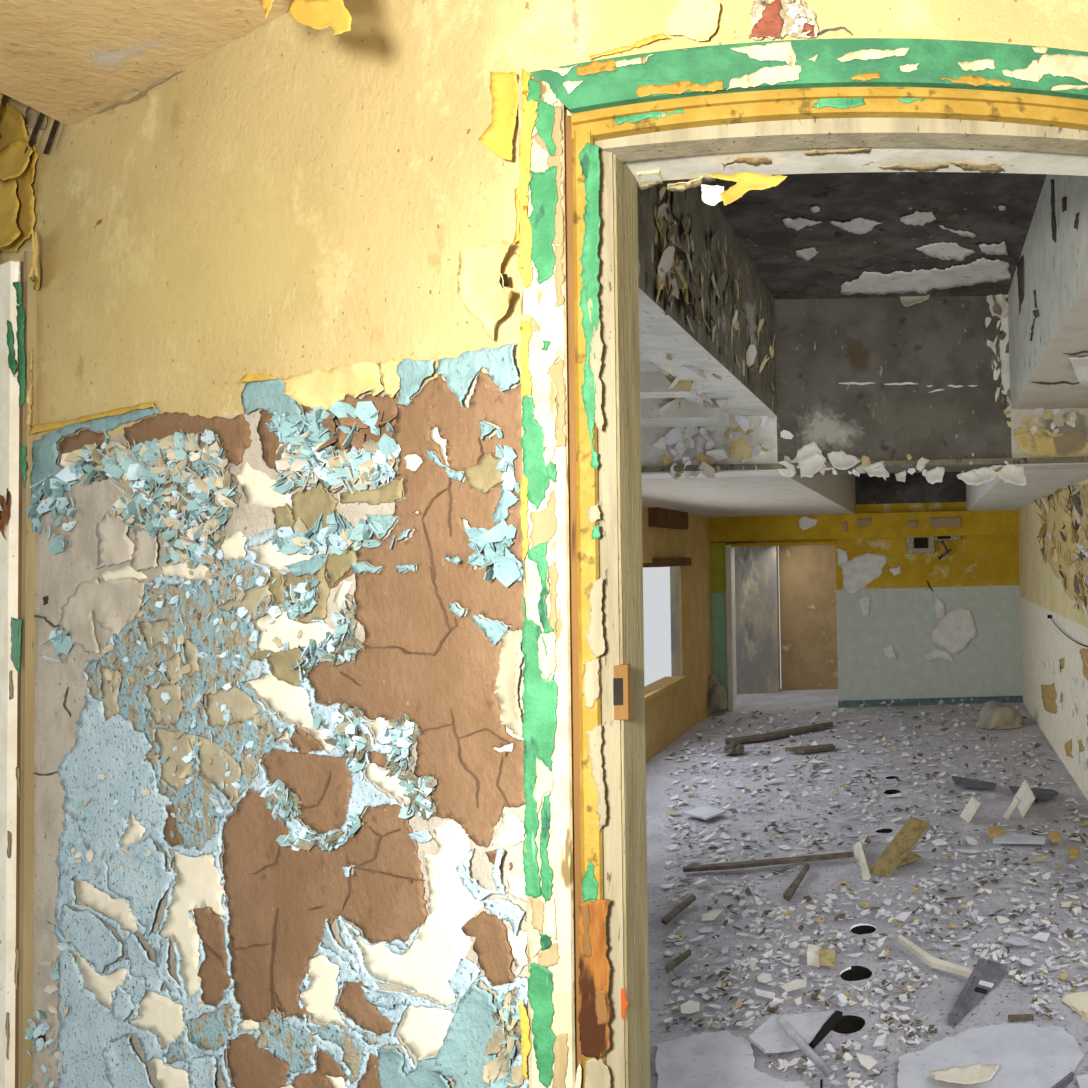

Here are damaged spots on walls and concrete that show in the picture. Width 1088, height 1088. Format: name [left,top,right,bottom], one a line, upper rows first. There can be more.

flaking render [636,0,819,97]
peeling [837,48,920,81]
peeling [939,46,1088,87]
peeling [636,155,788,388]
peeling [654,211,1088,486]
crack [475,437,484,466]
peeling [0,0,720,1088]
crack [363,478,458,656]
crack [298,770,331,810]
crack [417,709,510,808]
crack [308,826,425,911]
crack [203,908,282,1011]